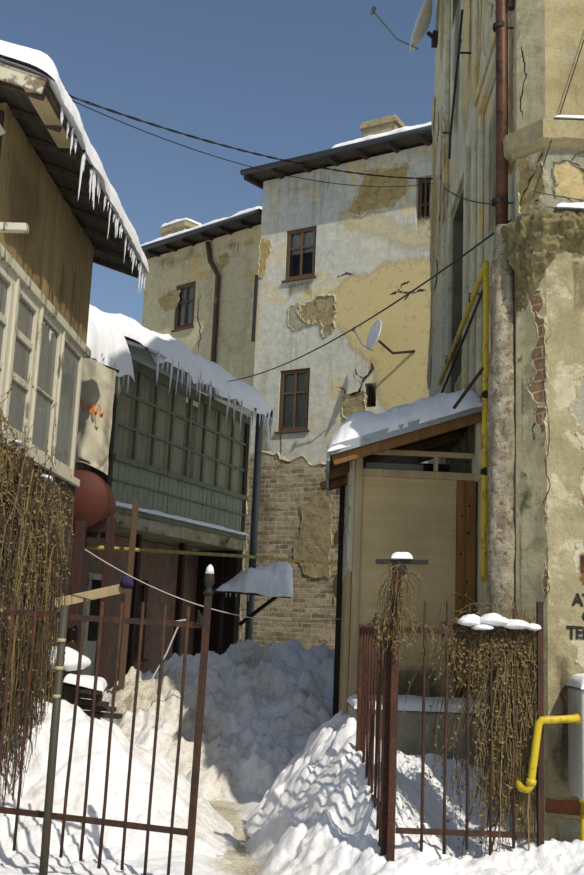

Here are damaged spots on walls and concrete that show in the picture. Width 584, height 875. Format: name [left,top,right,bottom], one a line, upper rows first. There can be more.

crack [519,47,527,117]
peeling [509,156,584,216]
peeling [286,97,445,420]
flaking render [526,288,549,461]
spalling [568,373,584,449]
flaking render [239,450,340,650]
peeling [573,542,584,578]